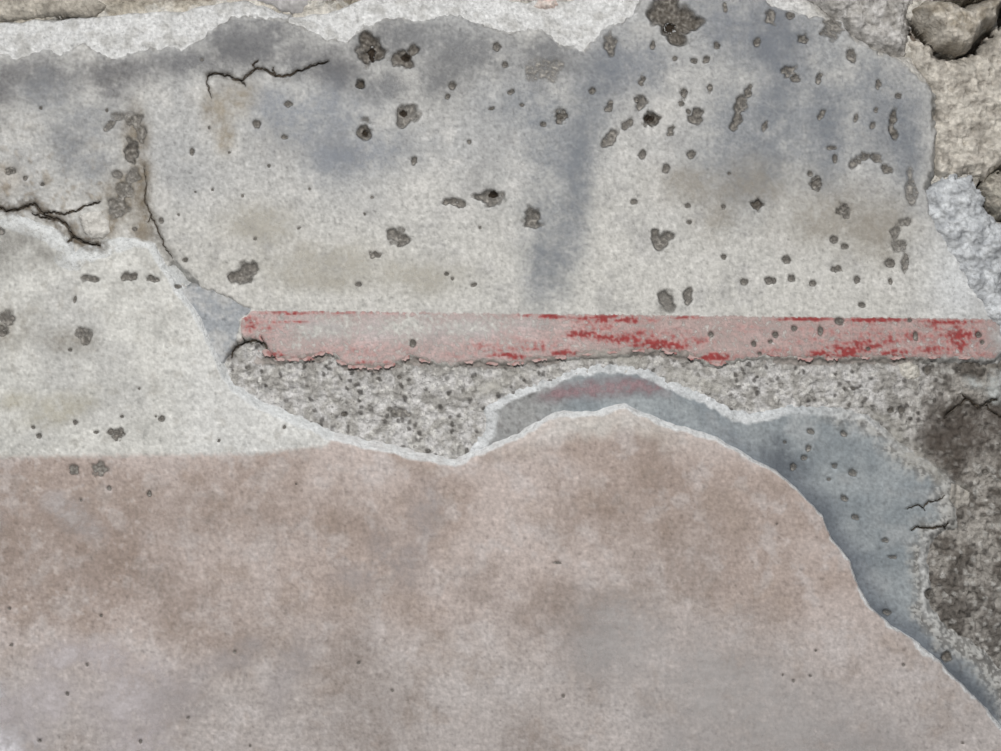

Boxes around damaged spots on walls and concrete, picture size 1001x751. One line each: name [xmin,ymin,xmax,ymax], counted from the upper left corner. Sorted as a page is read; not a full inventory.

spalling [355,31,419,68]
spalling [647,0,704,61]
spalling [765,10,795,24]
spalling [819,20,845,39]
crack [206,60,328,98]
crack [0,199,104,248]
crack [141,163,173,258]
peeling [254,339,433,379]
peeling [751,332,941,375]
spalling [392,406,411,417]
crack [944,394,1001,418]
crack [907,495,948,530]